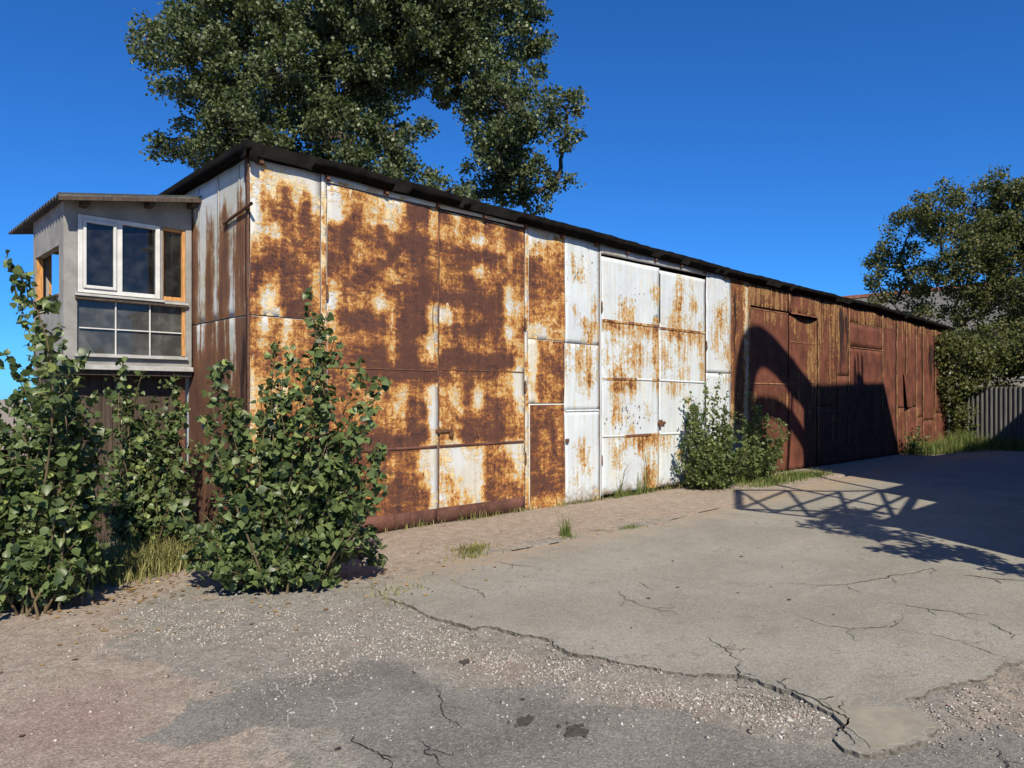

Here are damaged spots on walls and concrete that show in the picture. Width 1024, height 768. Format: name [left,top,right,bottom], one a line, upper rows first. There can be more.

rust [188,163,945,539]
crack [797,568,1024,658]
crack [707,637,751,680]
crack [778,678,855,744]
crack [423,742,453,767]